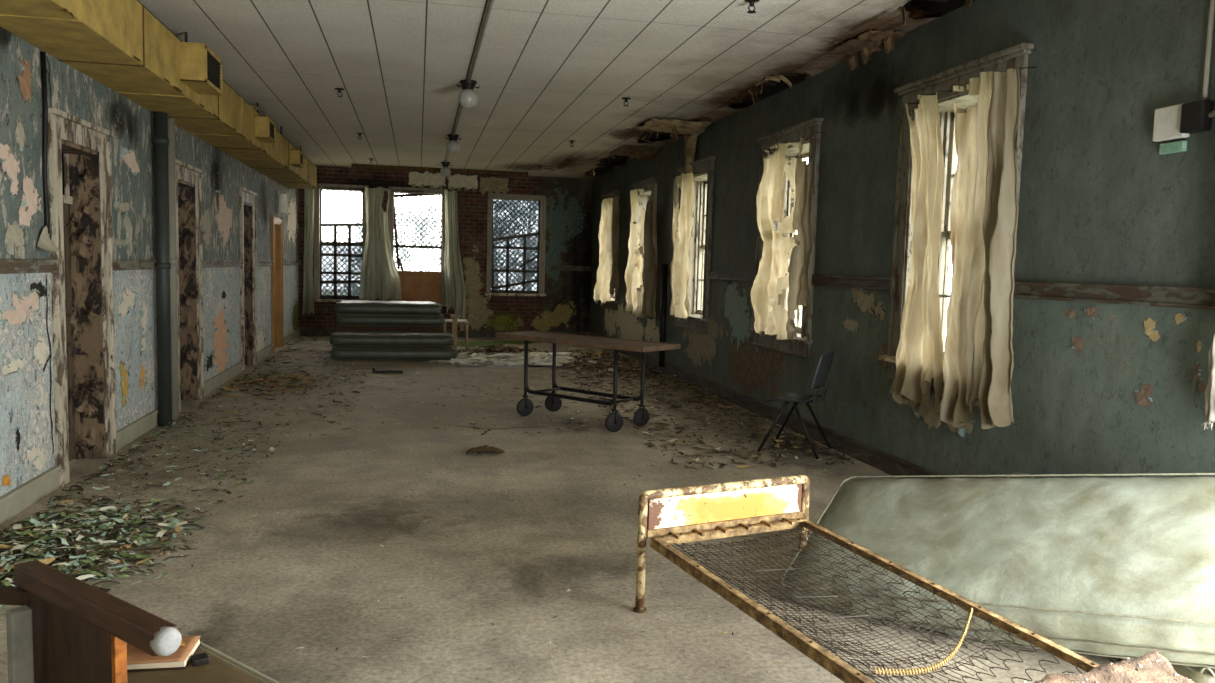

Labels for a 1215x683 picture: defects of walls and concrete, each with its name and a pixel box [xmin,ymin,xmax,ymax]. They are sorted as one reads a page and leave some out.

peeling [0,58,62,259]
peeling [120,147,141,175]
damp [508,155,590,170]
peeling [202,159,233,251]
peeling [287,196,299,245]
spalling [545,182,586,285]
peeling [0,281,49,334]
peeling [2,334,48,376]
peeling [118,288,148,408]
peeling [205,291,229,374]
spalling [457,244,494,331]
spalling [530,301,577,332]